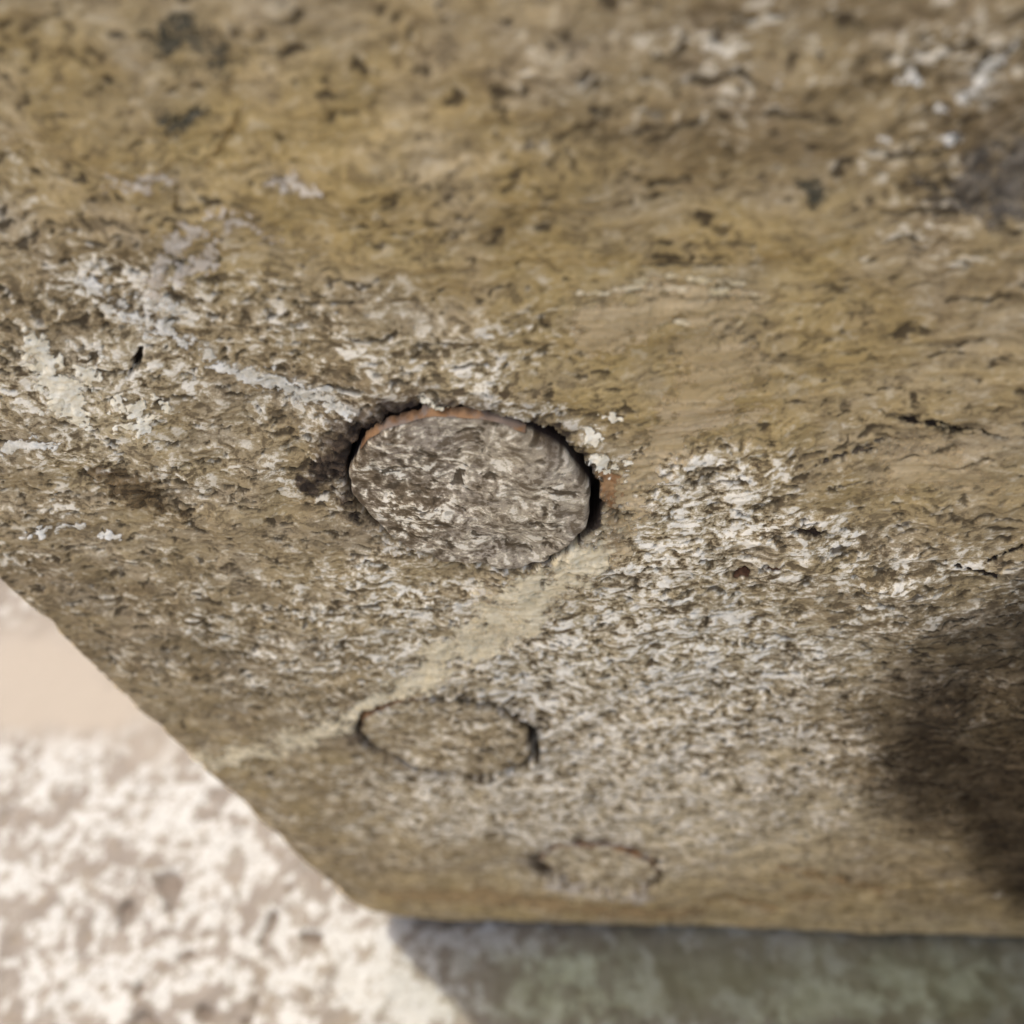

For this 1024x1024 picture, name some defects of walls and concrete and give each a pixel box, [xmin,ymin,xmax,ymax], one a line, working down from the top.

peeling [189,278,773,773]
corrosion [597,469,627,509]
damp [892,686,1024,902]